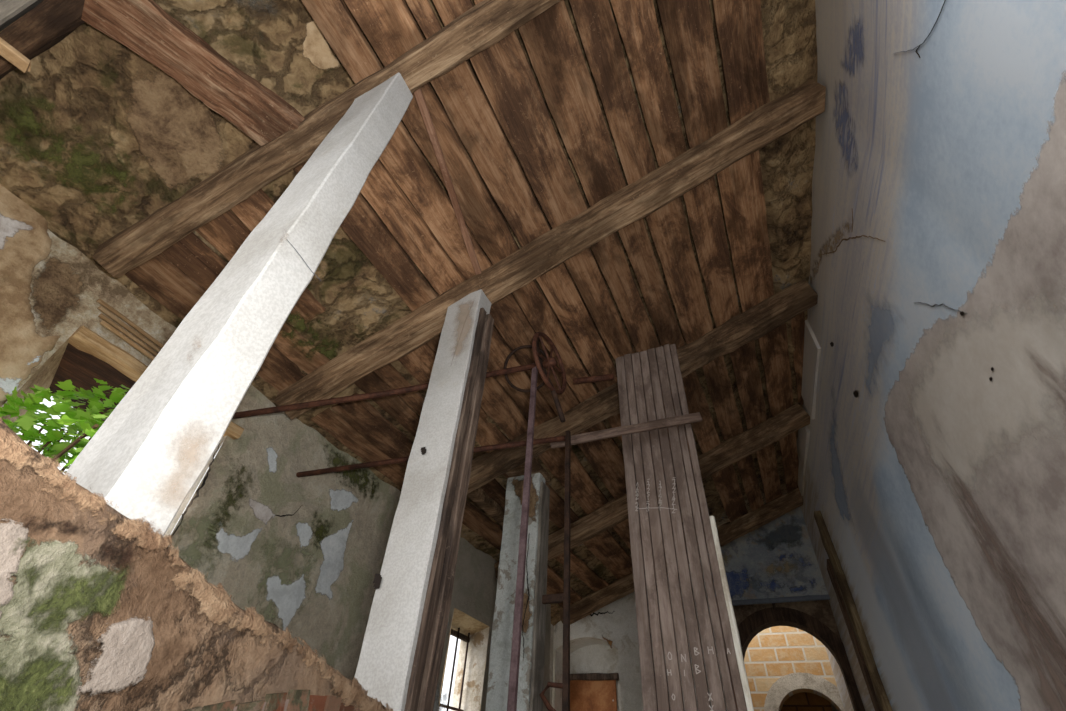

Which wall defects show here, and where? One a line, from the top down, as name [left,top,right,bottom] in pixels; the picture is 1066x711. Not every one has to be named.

crack [893,0,946,58]
peeling [0,184,83,401]
peeling [883,72,1066,711]
peeling [216,499,275,562]
peeling [330,489,358,511]
peeling [512,477,539,521]
peeling [266,521,353,631]
peeling [0,518,155,711]
peeling [522,587,532,633]